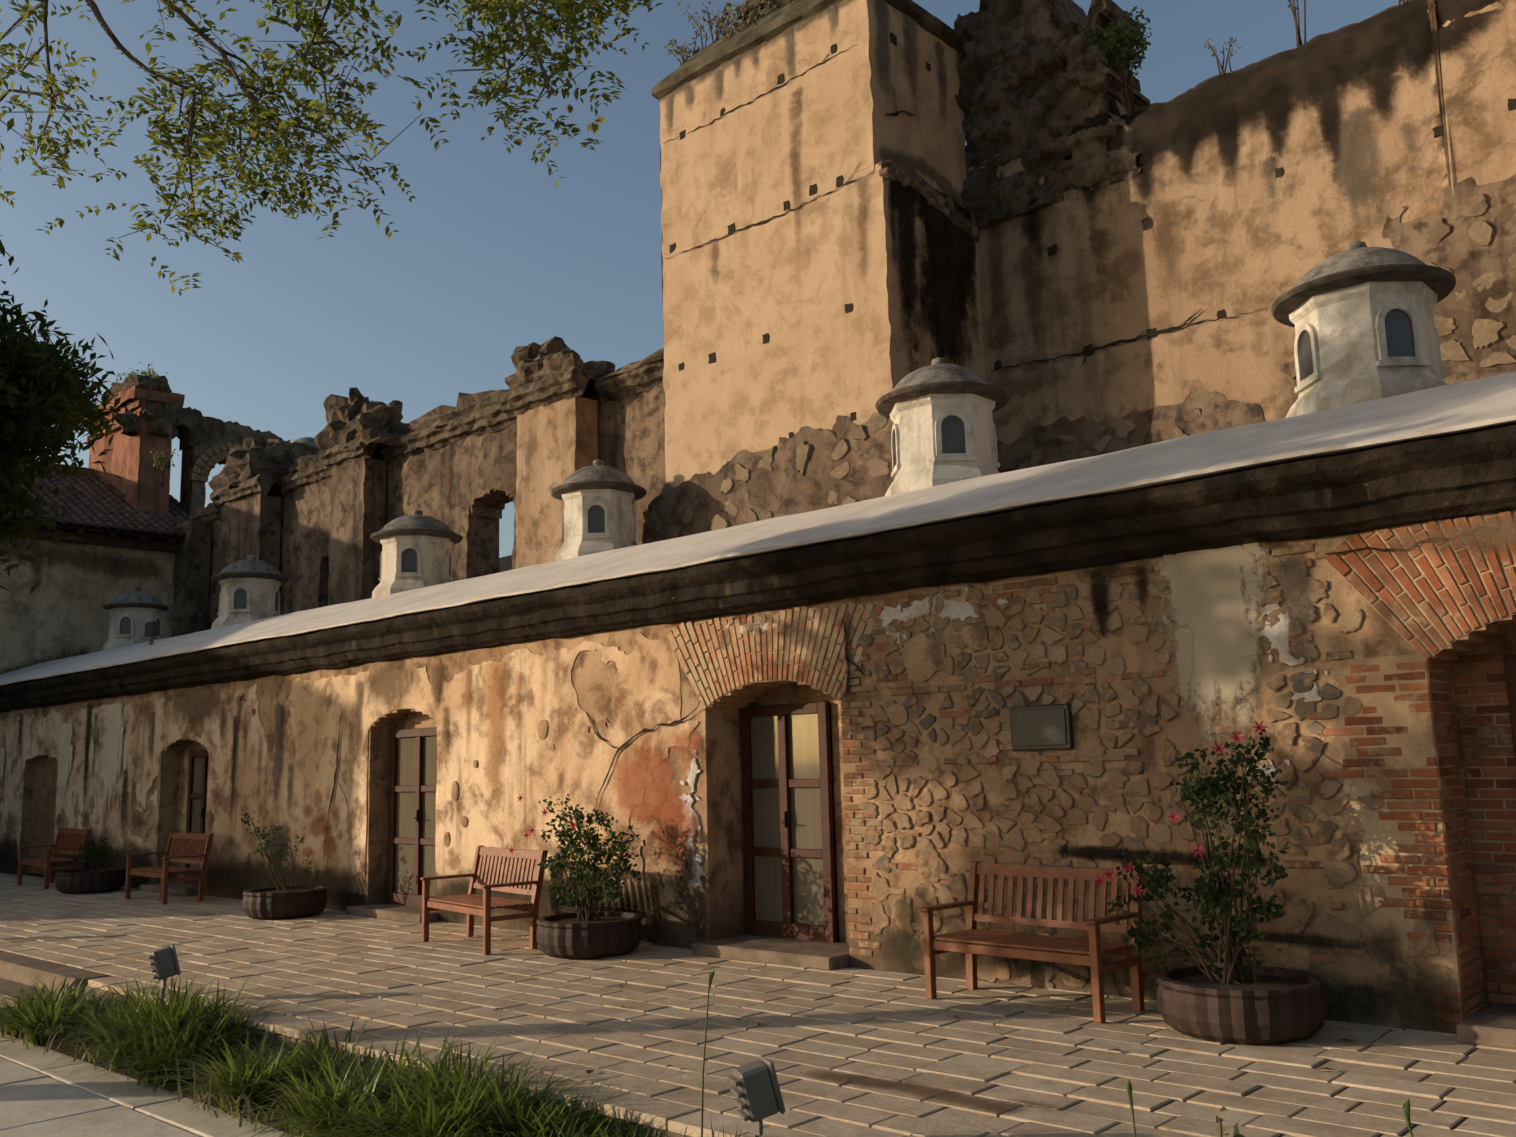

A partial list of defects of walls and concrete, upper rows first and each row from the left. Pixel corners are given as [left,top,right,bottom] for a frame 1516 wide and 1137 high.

water stain [876,0,918,115]
water stain [936,42,946,115]
water stain [1052,0,1497,272]
water stain [856,179,866,264]
water stain [881,148,1009,371]
water stain [1020,197,1042,338]
flaking render [1382,174,1516,385]
flaking render [1280,360,1297,386]
peeling [725,618,784,636]
flaking render [862,587,1008,680]
crack [587,701,700,806]
peeling [614,735,706,941]